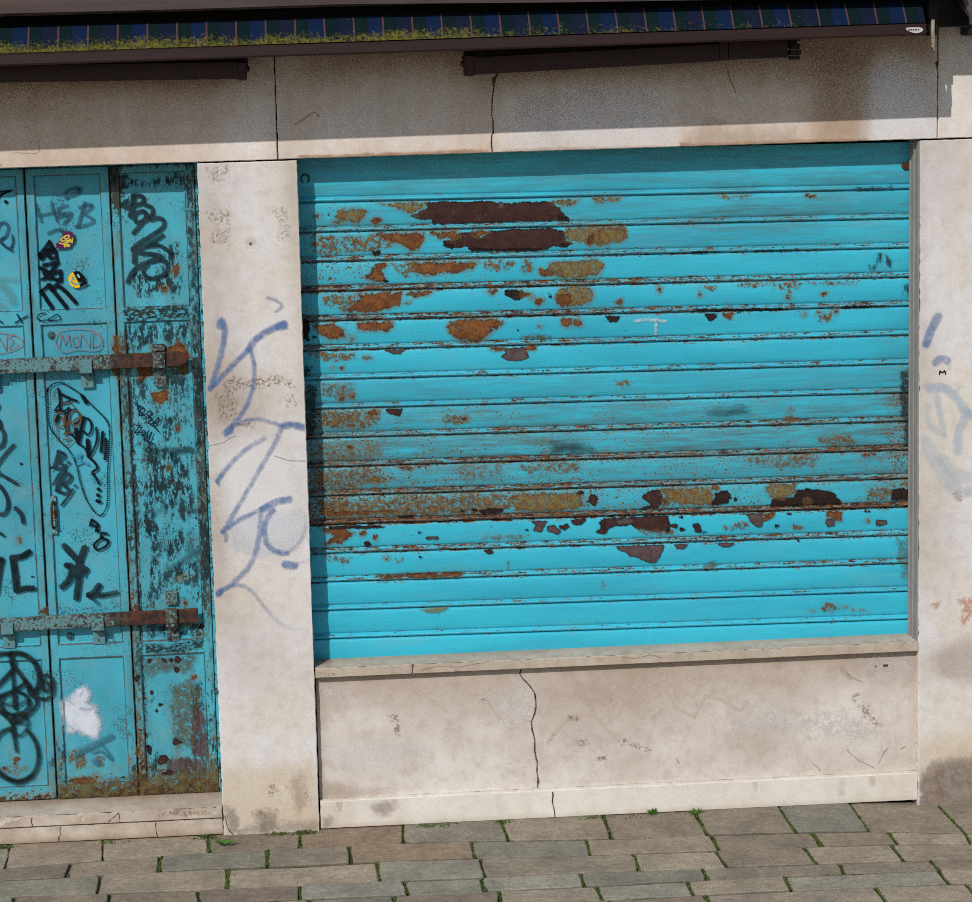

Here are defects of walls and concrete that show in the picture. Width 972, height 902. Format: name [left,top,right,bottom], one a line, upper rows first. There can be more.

crack [490,73,498,152]
corrosion [565,225,628,247]
corrosion [303,208,605,370]
corrosion [695,280,857,321]
corrosion [804,304,877,322]
corrosion [317,382,402,428]
corrosion [315,467,583,566]
corrosion [864,477,908,526]
corrosion [134,656,204,746]
corrosion [57,732,219,799]
crack [519,669,556,818]
damp [919,741,972,807]